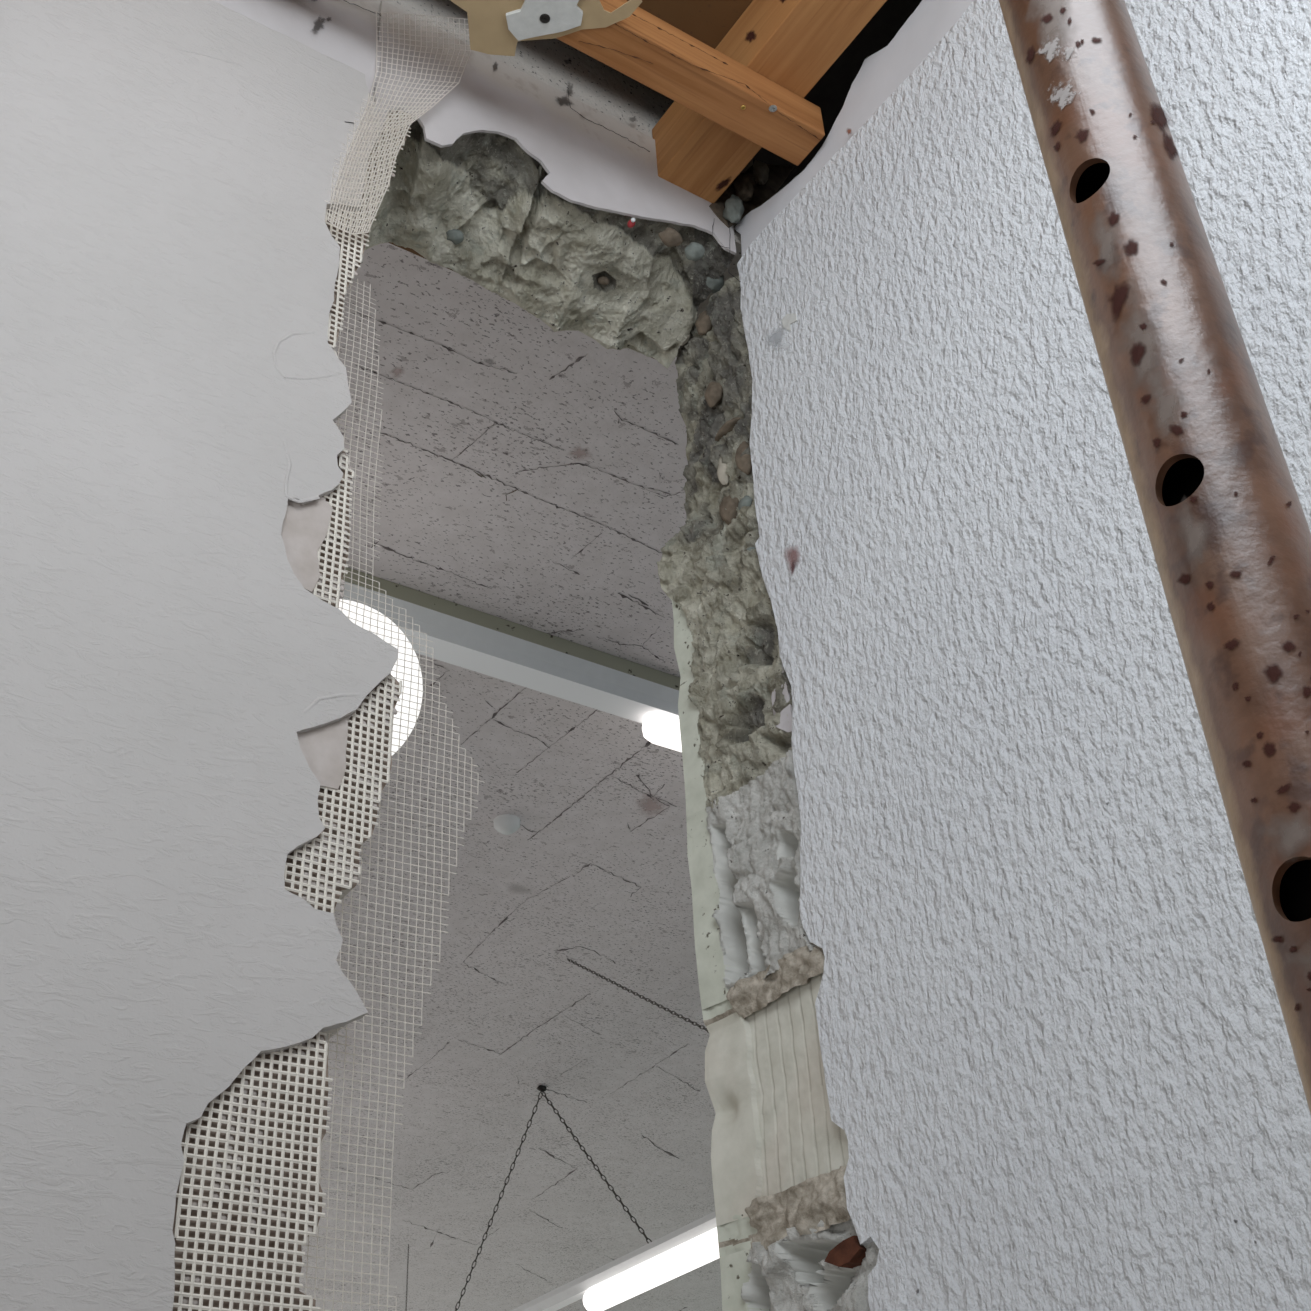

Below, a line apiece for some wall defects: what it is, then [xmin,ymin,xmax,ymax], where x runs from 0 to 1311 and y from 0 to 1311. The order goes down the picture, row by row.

corrosion [1151,104,1178,158]
flaking render [324,93,412,348]
flaking render [709,164,795,228]
corrosion [1124,240,1138,255]
corrosion [1110,285,1129,318]
corrosion [1131,323,1147,365]
corrosion [1153,412,1187,447]
flaking render [281,449,355,608]
flaking render [771,663,793,733]
corrosion [1265,665,1282,682]
flaking render [284,674,402,913]
flaking render [172,1031,333,1311]